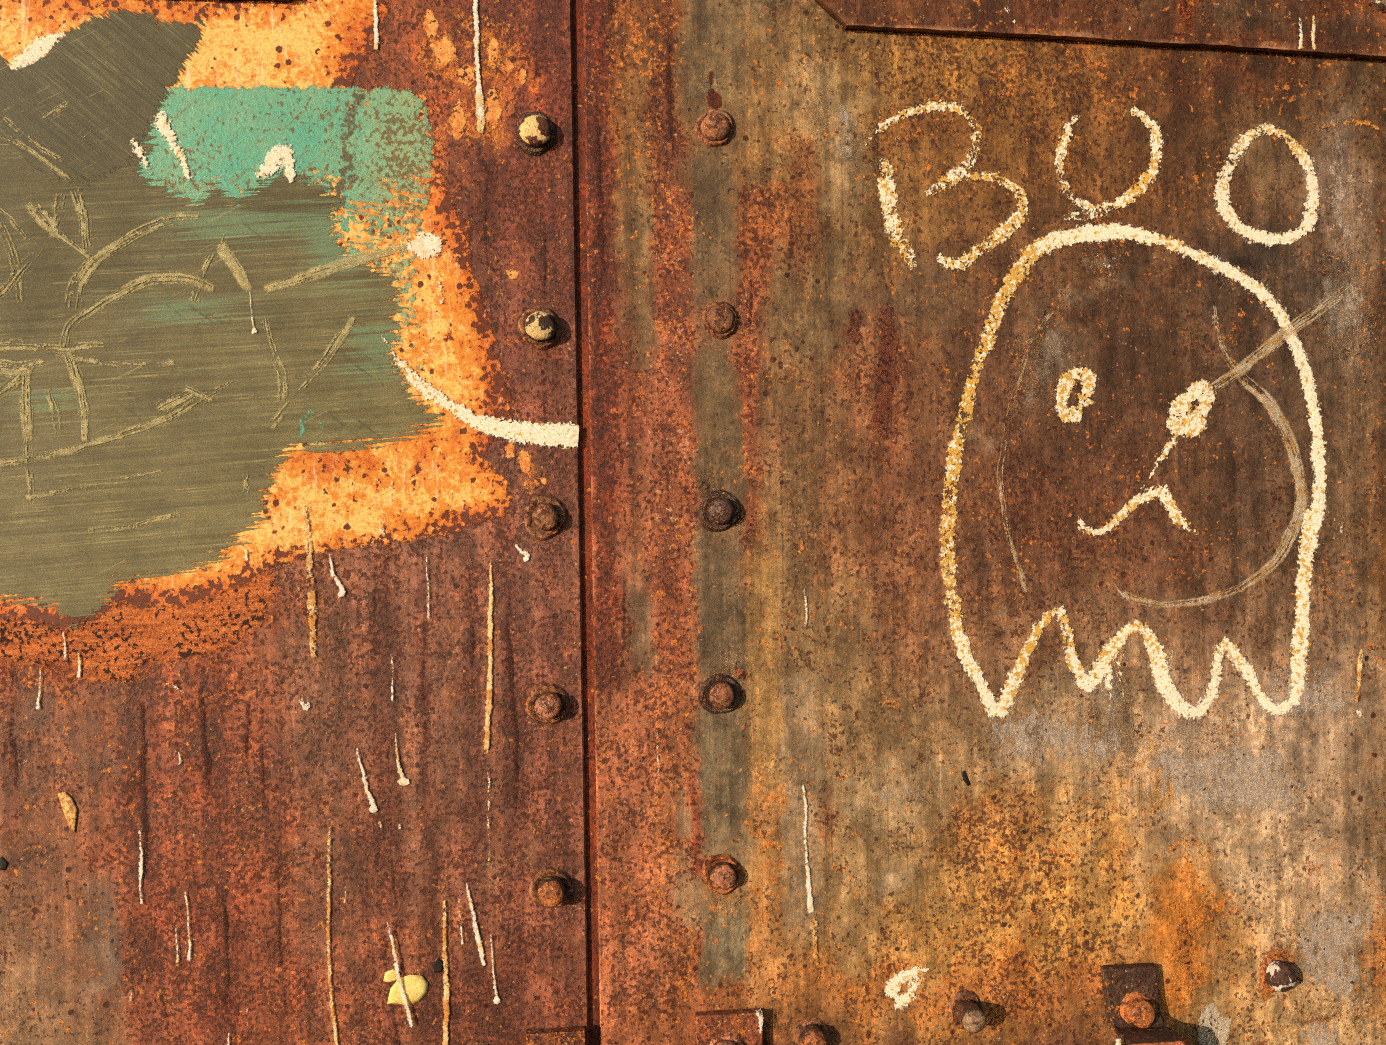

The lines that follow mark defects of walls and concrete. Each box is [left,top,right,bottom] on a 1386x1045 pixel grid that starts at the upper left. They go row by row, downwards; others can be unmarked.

rust [665,43,674,139]
rust [707,70,722,110]
rust [594,104,605,292]
peeling [0,0,547,631]
rust [0,567,279,691]
rust [137,705,148,874]
rust [197,686,211,795]
rust [243,701,266,818]
rust [505,592,519,811]
rust [1176,902,1195,1017]
rust [1258,945,1296,1002]